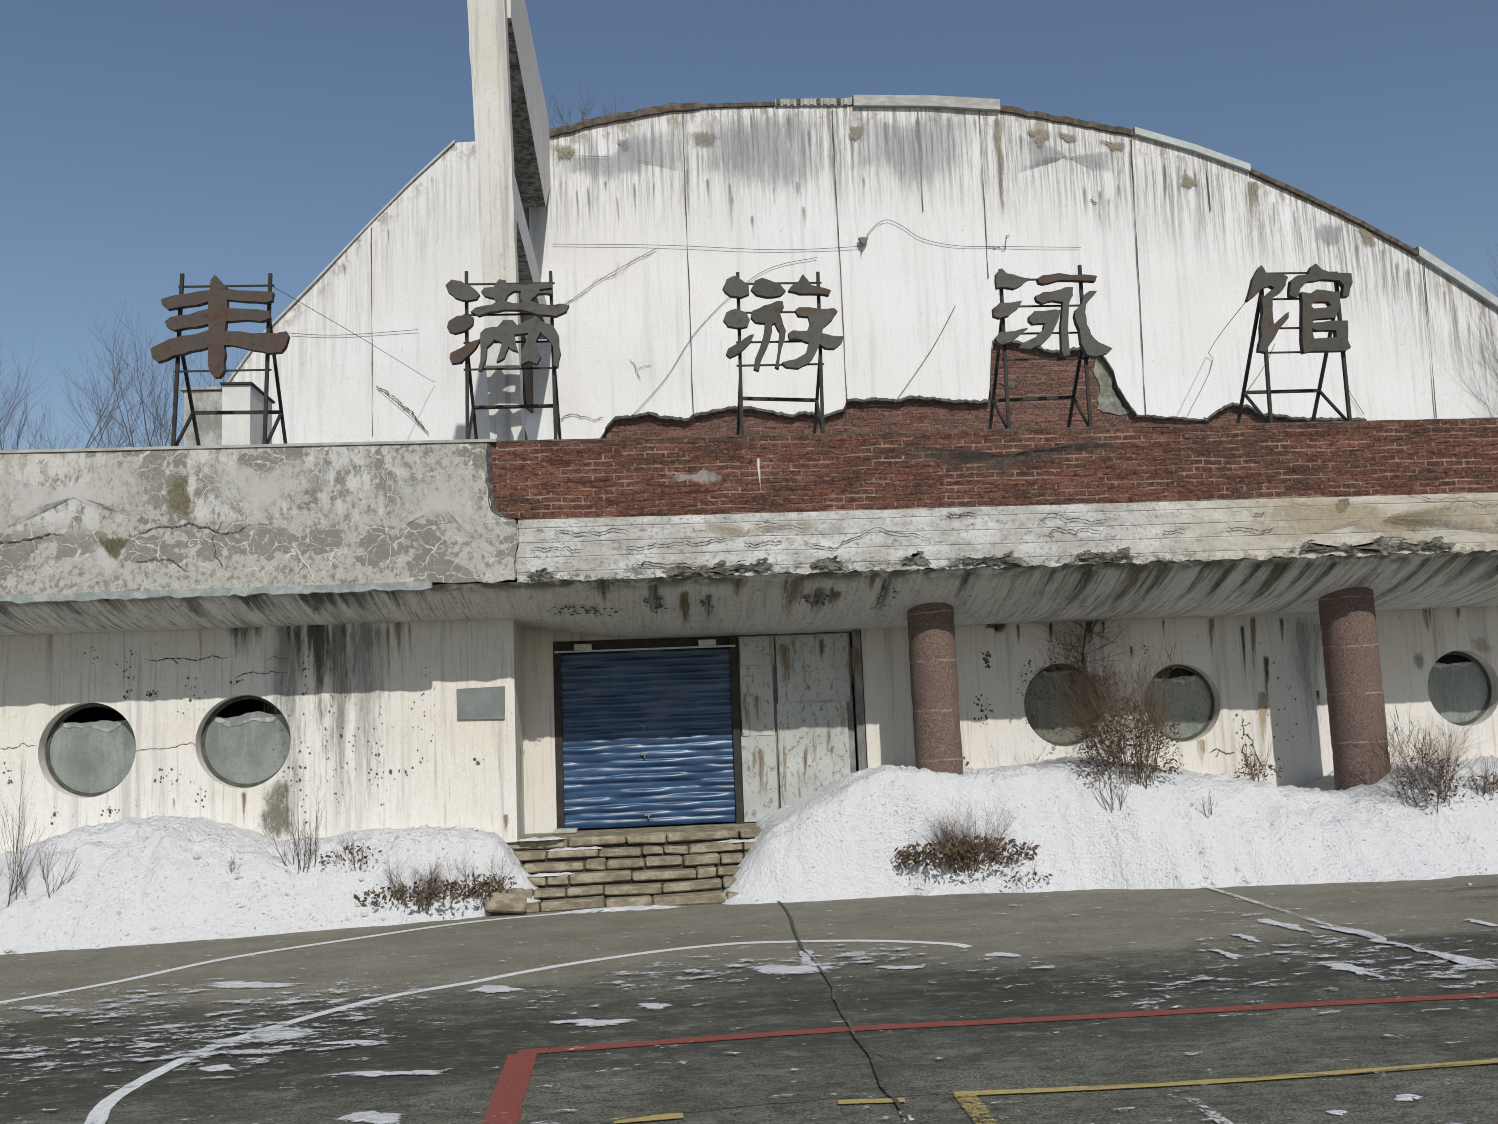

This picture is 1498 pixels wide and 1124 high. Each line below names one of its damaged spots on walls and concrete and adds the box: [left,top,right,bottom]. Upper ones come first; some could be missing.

water stain [993,116,1004,207]
flaking render [605,340,1137,438]
crack [0,533,61,543]
crack [129,522,251,571]
crack [293,530,315,582]
crack [382,453,391,579]
spalling [662,557,773,577]
spalling [901,551,931,565]
spalling [950,551,1023,566]
spalling [1071,546,1141,562]
water stain [287,591,397,724]
crack [551,901,950,1124]